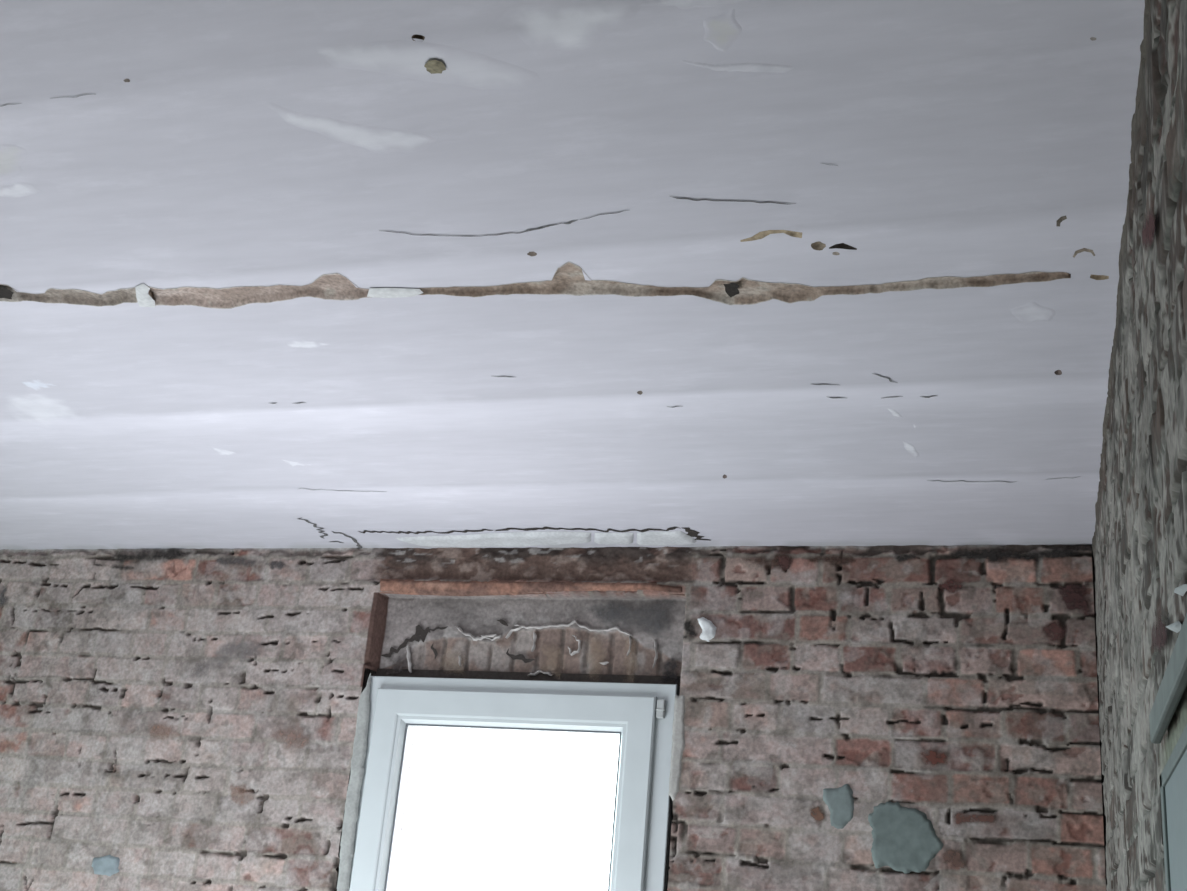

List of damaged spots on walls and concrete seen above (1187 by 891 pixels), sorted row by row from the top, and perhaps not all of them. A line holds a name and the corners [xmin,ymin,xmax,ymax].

crack [386,210,628,237]
peeling [456,619,632,656]